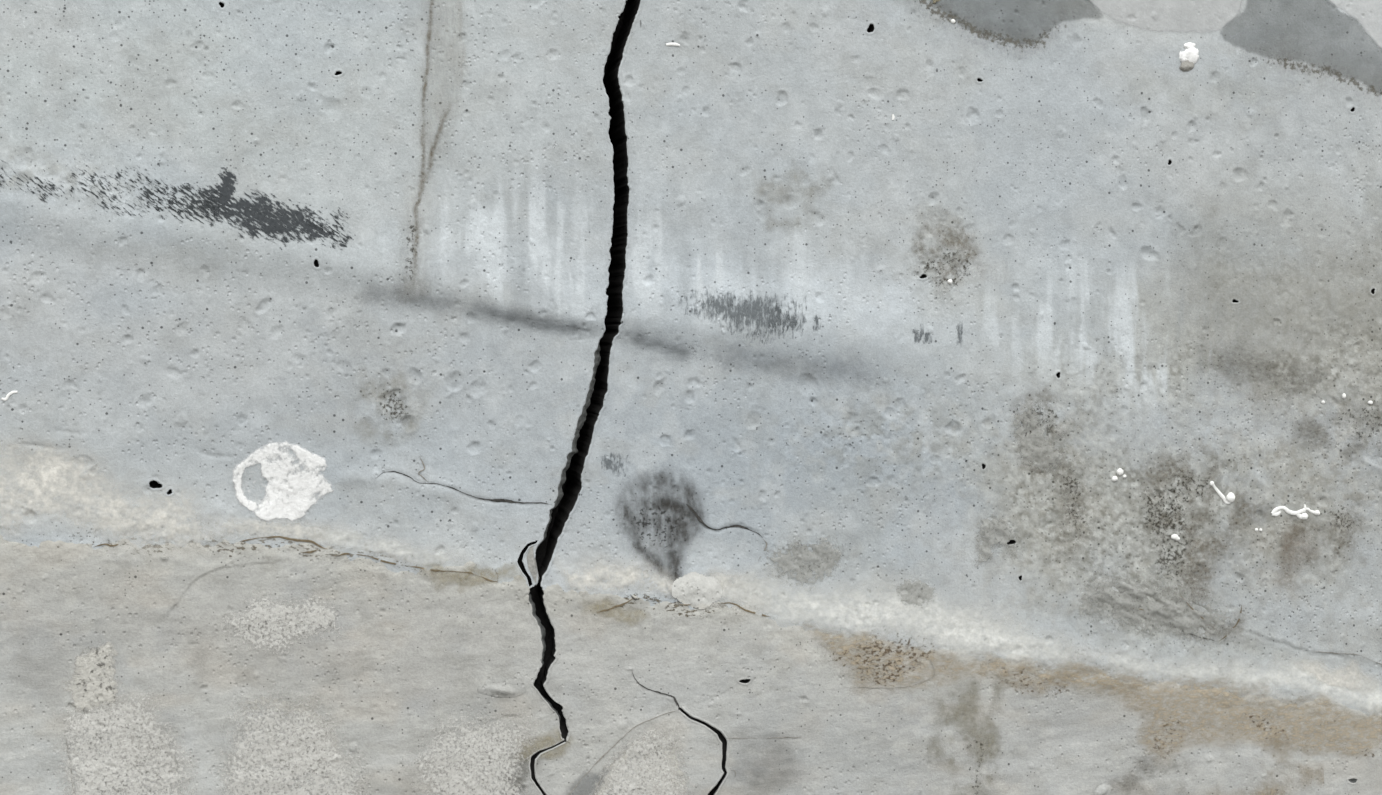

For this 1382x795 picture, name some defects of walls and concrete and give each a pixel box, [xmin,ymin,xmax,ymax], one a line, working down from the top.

water stain [919,0,1059,48]
water stain [1268,59,1382,95]
water stain [10,169,72,203]
water stain [154,167,237,226]
water stain [308,208,354,249]
crack [57,0,800,795]
water stain [1110,655,1382,714]